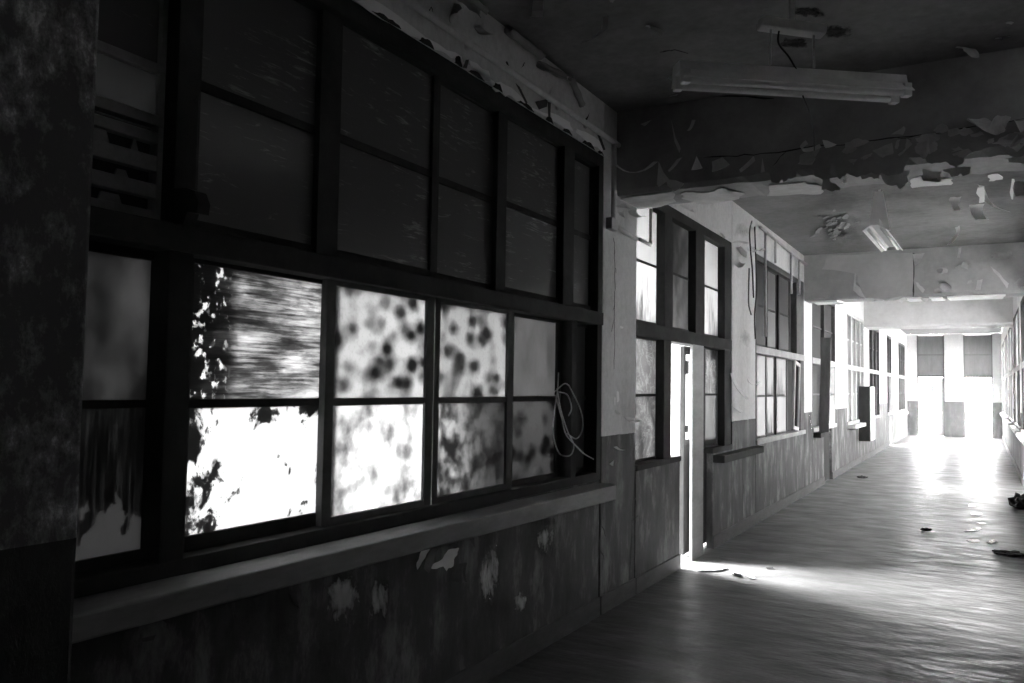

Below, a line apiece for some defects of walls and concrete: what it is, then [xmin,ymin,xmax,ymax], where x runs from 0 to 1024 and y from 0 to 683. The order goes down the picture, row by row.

peeling [355,0,605,156]
crack [710,126,975,164]
spalling [614,120,744,218]
peeling [691,115,1024,220]
peeling [810,210,859,240]
peeling [416,548,459,571]
leakage [480,555,498,595]
leakage [328,578,359,621]
leakage [371,581,388,617]